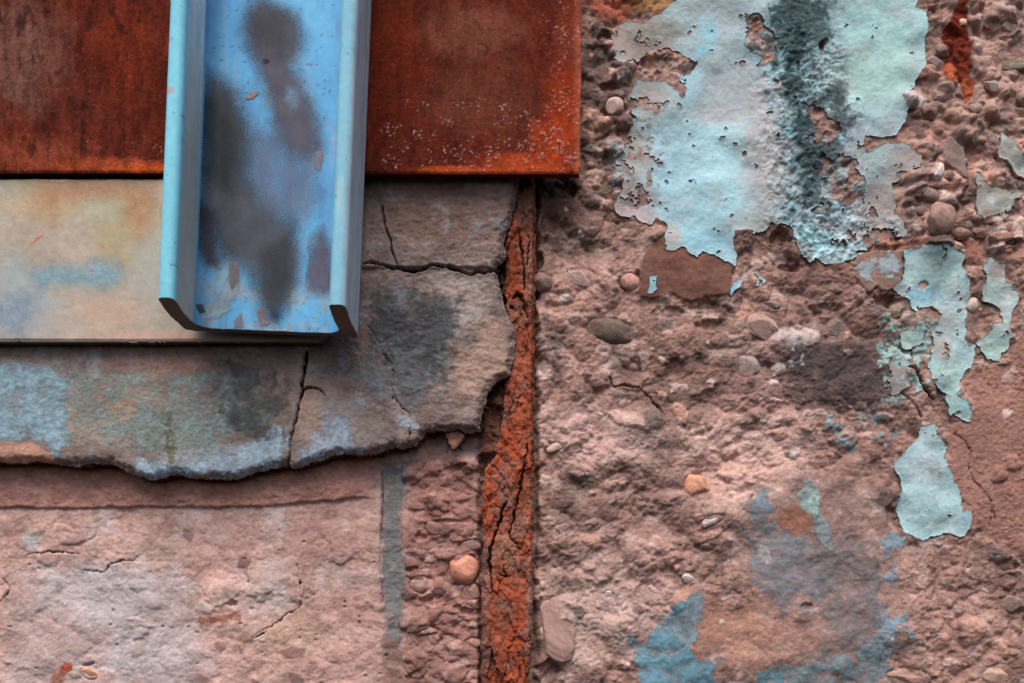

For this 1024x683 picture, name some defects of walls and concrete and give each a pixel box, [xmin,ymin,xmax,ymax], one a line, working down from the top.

rust [941,0,975,103]
damp [201,95,318,220]
damp [198,205,220,268]
crack [367,224,497,277]
crack [510,228,530,333]
peeling [605,0,1024,459]
crack [289,352,323,466]
crack [370,329,411,443]
crack [488,444,529,592]
peeling [756,424,972,683]